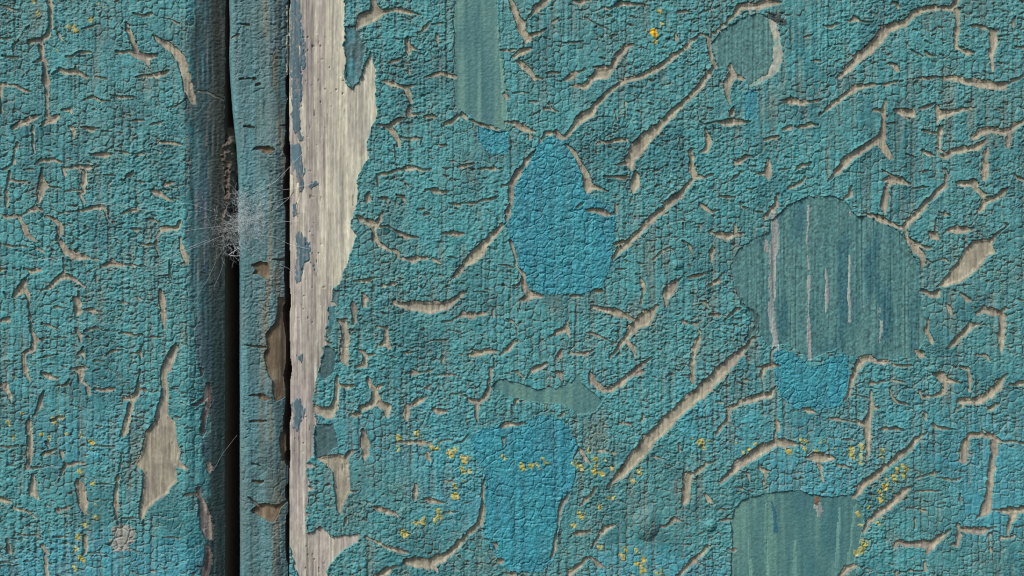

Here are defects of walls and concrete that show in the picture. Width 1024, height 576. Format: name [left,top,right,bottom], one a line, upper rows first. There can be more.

crack [0,0,225,576]
peeling [248,0,422,576]
crack [312,0,1024,576]
peeling [937,225,1007,287]
peeling [134,343,189,520]
leakage [748,499,778,576]
leakage [835,504,859,576]